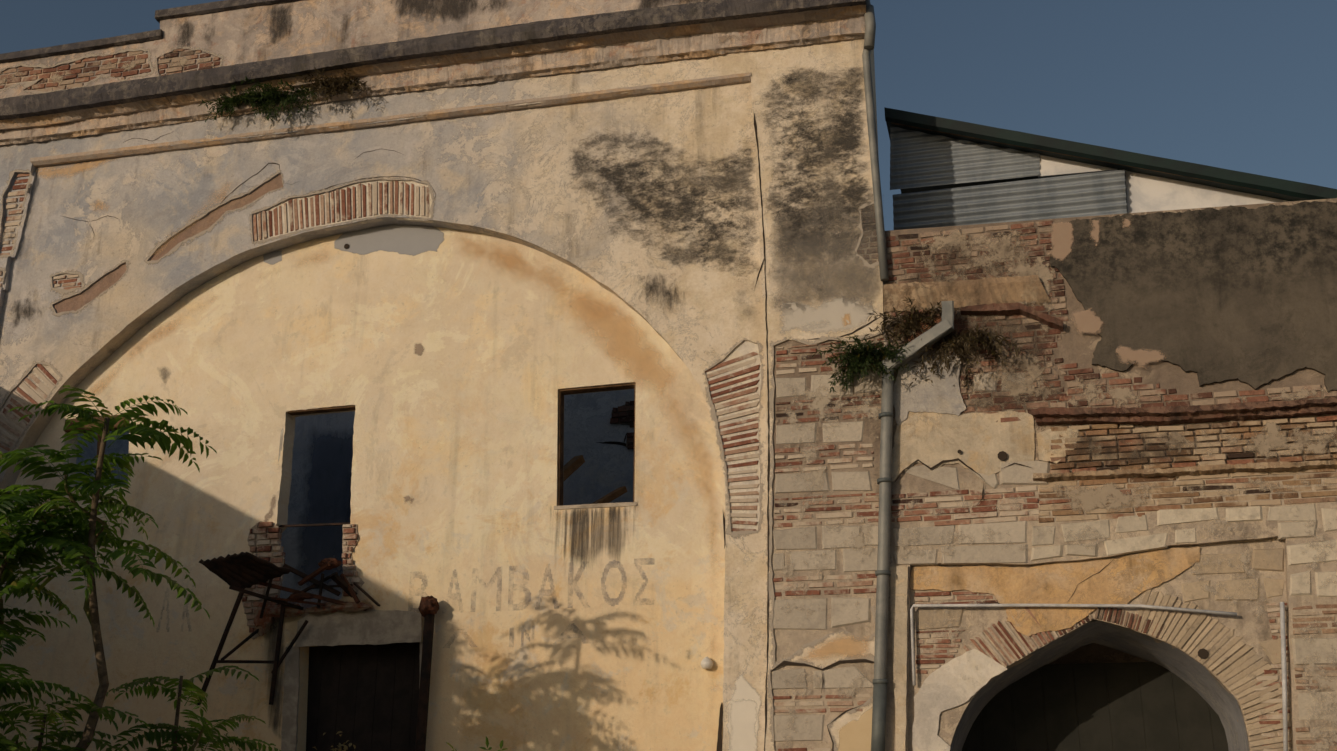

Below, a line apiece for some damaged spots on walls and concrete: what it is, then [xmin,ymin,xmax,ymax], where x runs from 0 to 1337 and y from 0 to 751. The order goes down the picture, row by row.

mould [396,0,505,19]
spalling [0,169,36,292]
spalling [145,170,444,265]
leakage [573,135,756,269]
leakage [766,68,877,308]
peeling [50,260,129,317]
leakage [649,280,677,308]
peeling [1072,308,1103,334]
peeling [1116,346,1165,367]
crack [754,114,882,751]
leakage [571,509,620,560]
spalling [704,298,893,751]